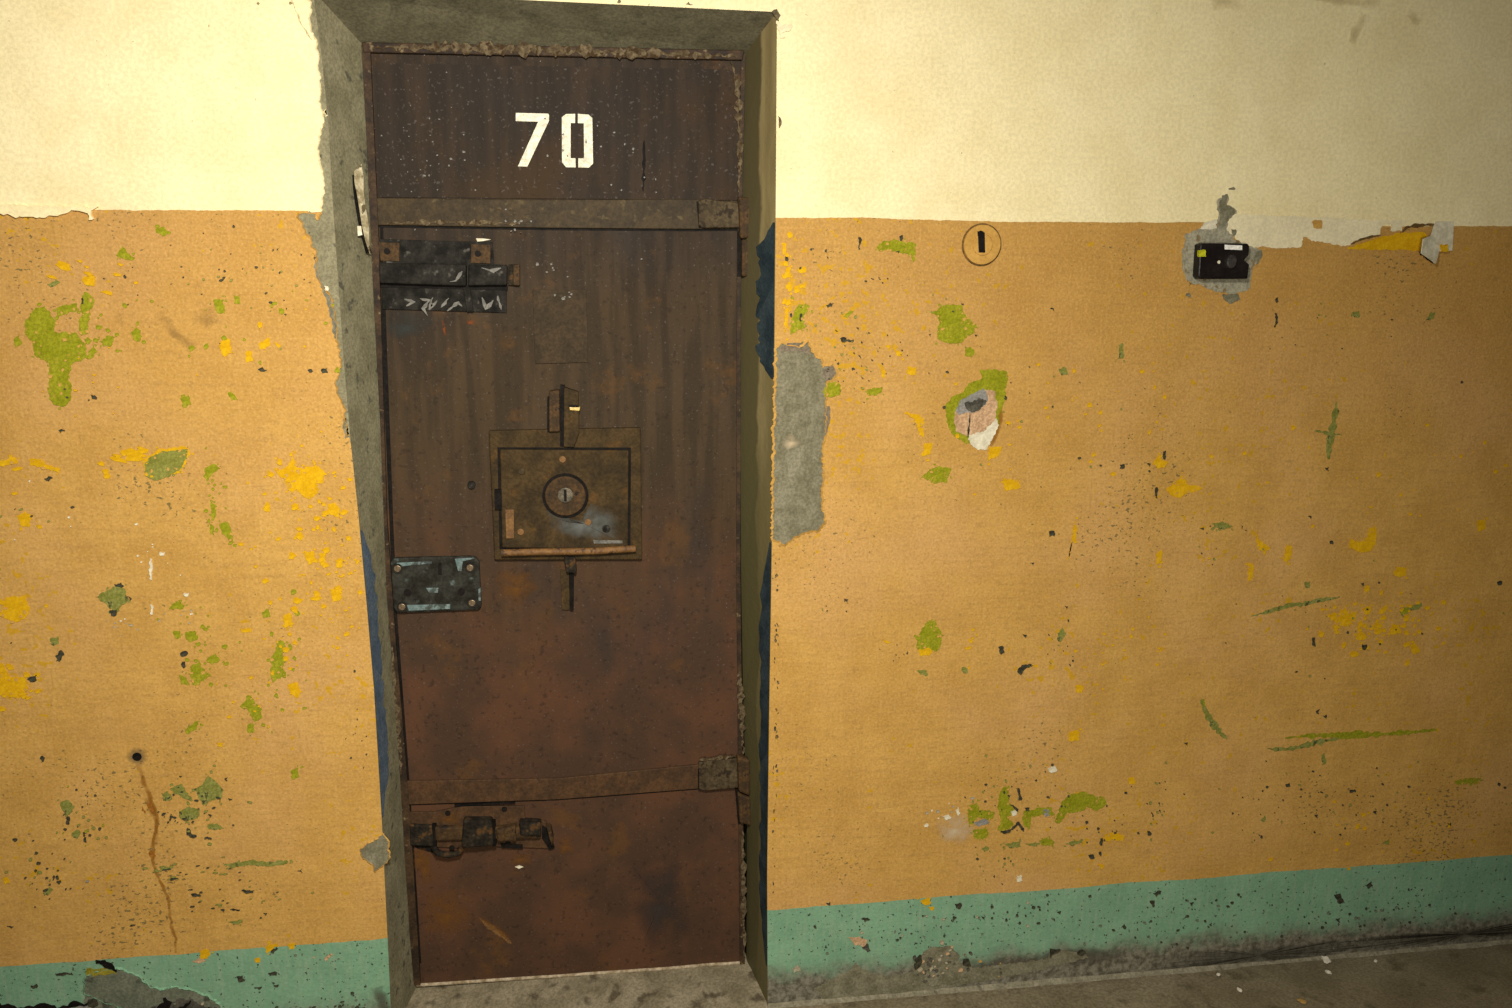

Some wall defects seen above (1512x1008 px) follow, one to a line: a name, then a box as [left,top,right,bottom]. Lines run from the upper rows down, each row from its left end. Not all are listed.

flaking render [170,0,351,442]
peeling [352,164,372,254]
peeling [1182,187,1454,315]
peeling [1029,343,1167,432]
peeling [1147,451,1203,498]
peeling [1049,517,1078,560]
flaking render [755,222,1054,965]
peeling [97,444,391,873]
corrosion [132,753,177,939]
flaking render [0,960,222,1008]
peeling [193,949,213,963]
peeling [237,941,340,990]